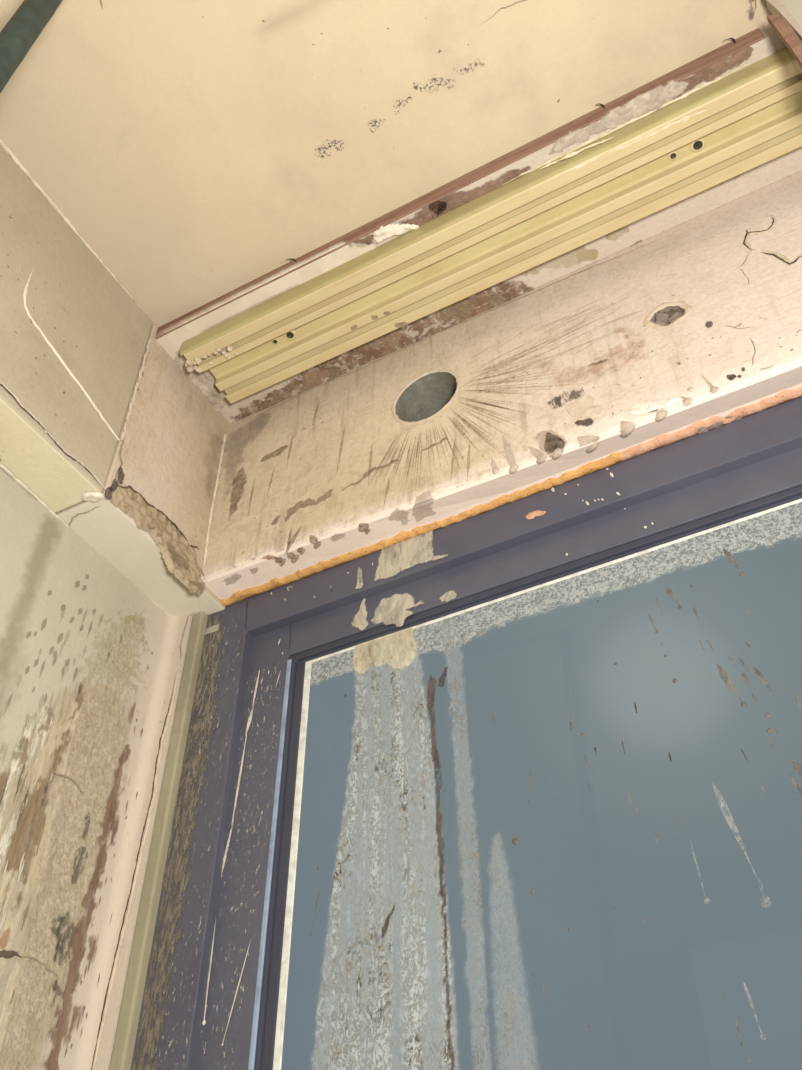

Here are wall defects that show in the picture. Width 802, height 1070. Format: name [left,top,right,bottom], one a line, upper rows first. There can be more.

crack [749,0,757,20]
damp [394,58,484,111]
crack [740,216,802,283]
spalling [643,301,693,330]
crack [0,339,151,526]
spalling [105,485,205,596]
rust [45,745,138,1070]
crack [0,949,57,975]